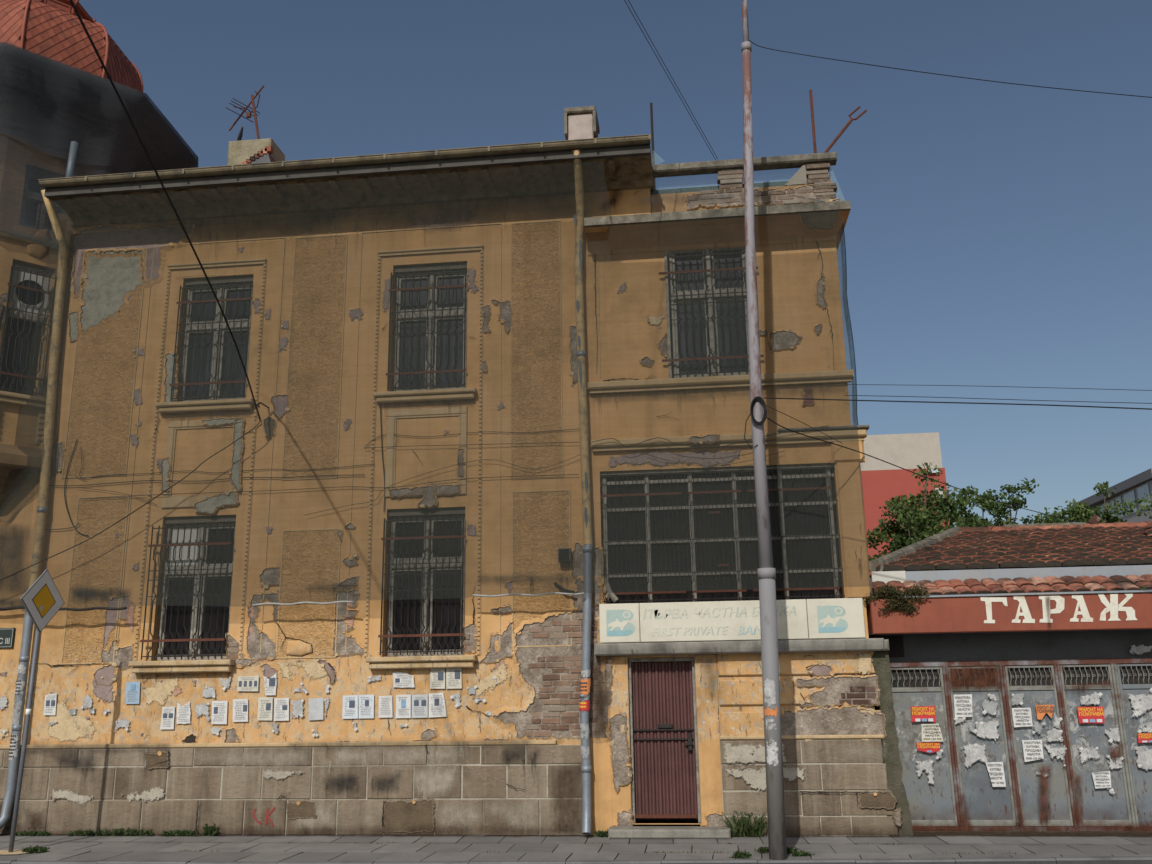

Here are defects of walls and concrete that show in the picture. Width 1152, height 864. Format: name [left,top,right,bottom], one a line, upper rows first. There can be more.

spalling [47,220,201,343]
spalling [480,299,513,335]
water stain [0,527,23,605]
spalling [225,553,364,685]
crack [277,623,336,686]
flaking render [463,546,632,793]
peeling [47,701,96,744]
spalling [781,652,887,781]
water stain [326,777,355,790]
peeling [724,743,766,792]